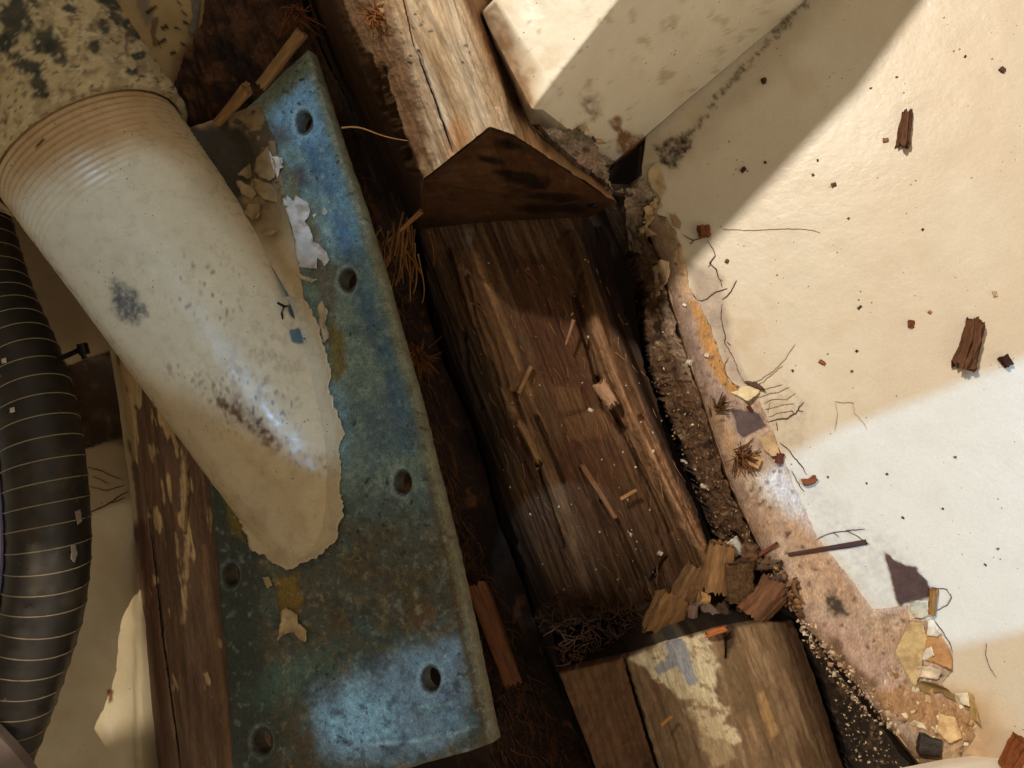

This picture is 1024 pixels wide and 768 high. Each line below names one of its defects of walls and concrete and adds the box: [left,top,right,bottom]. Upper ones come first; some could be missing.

mould [656,116,708,167]
crack [686,228,820,491]
peeling [616,162,980,764]